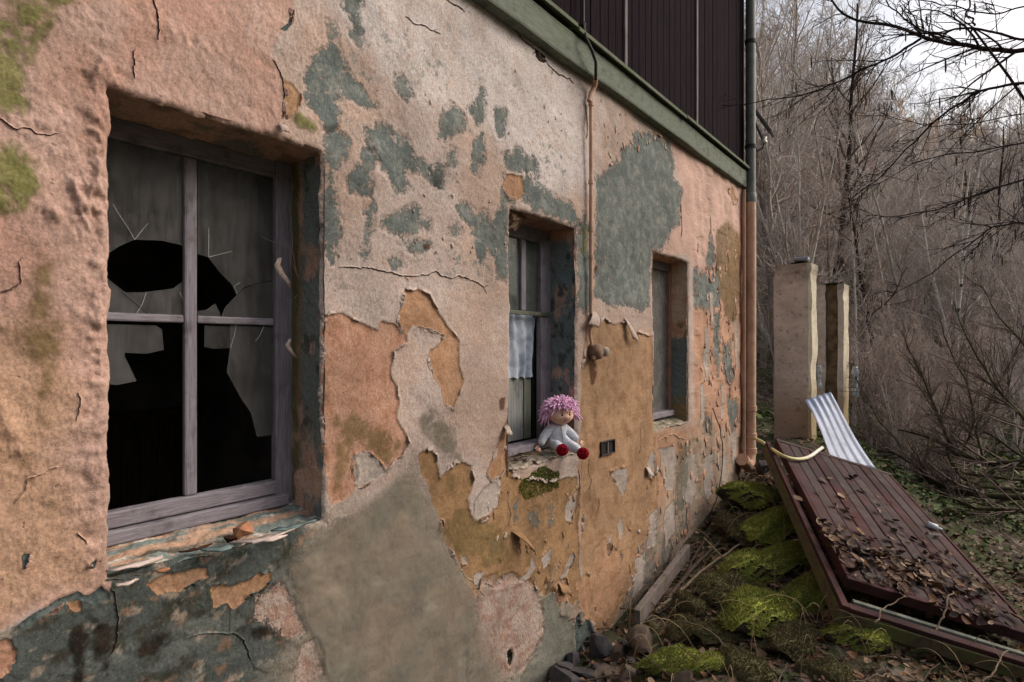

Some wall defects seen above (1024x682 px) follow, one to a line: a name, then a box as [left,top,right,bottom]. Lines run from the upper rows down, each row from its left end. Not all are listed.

crack [133,0,163,78]
crack [0,117,58,136]
crack [340,265,490,293]
peeling [278,0,739,682]
peeling [178,520,317,553]
peeling [0,638,17,679]
peeling [19,554,325,682]
crack [186,606,269,674]